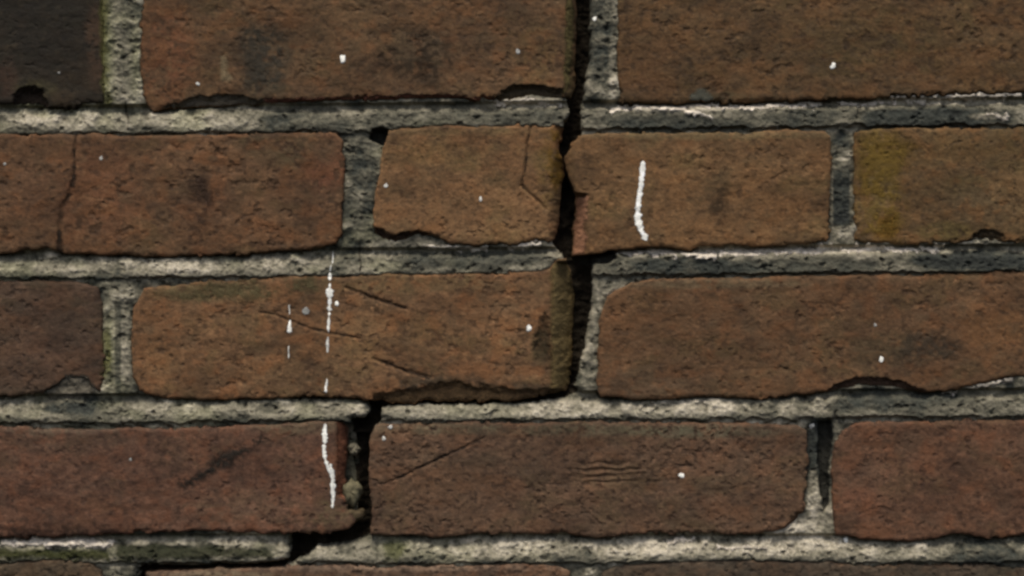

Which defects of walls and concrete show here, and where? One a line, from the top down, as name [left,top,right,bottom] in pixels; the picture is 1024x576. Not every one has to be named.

crack [56,133,77,255]
crack [138,0,592,576]